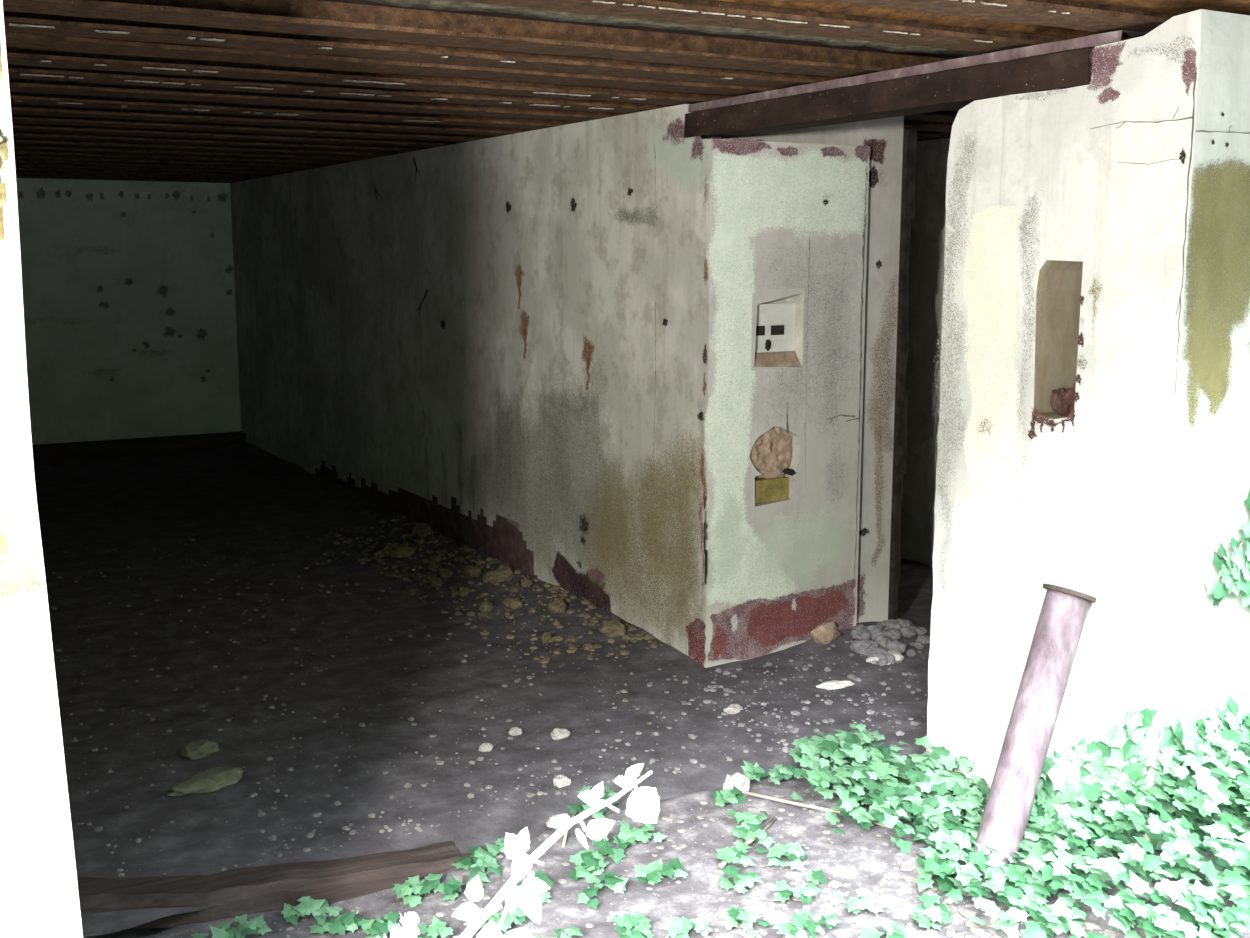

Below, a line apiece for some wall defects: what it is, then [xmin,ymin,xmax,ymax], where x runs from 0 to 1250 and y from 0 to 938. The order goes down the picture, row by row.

peeling [1087,35,1198,104]
spalling [315,461,538,579]
water stain [424,351,712,655]
spalling [551,551,612,613]
peeling [645,114,887,668]
water stain [1180,155,1250,431]